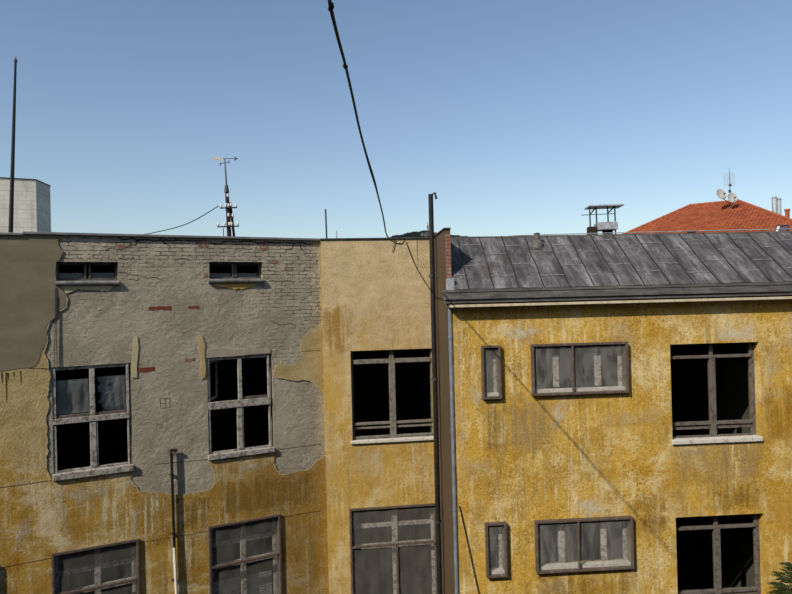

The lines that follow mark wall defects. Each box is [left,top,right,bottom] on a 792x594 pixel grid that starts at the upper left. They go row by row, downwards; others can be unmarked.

spalling [44,235,326,496]